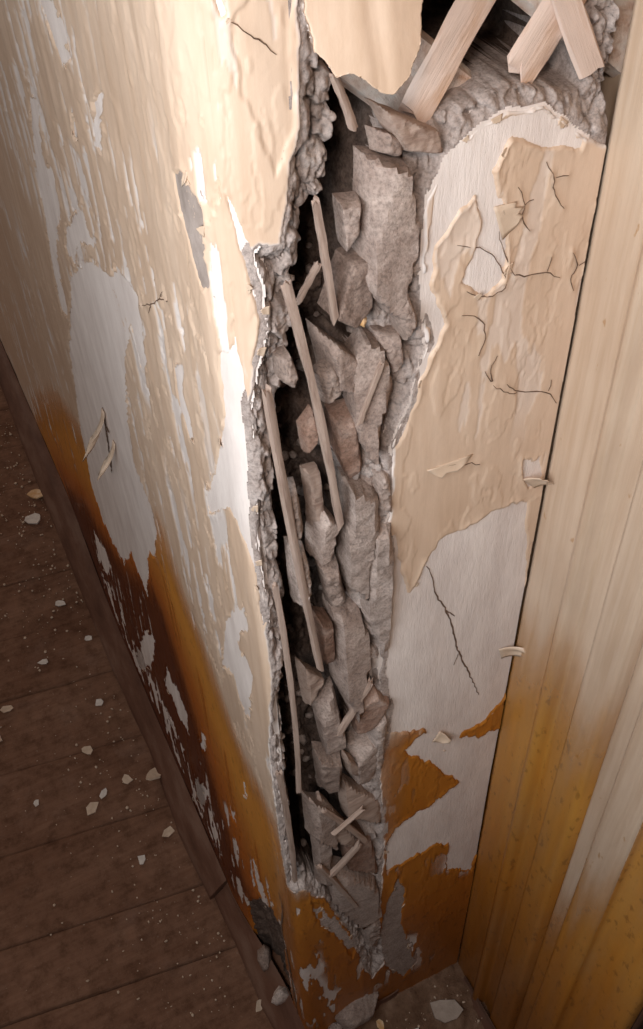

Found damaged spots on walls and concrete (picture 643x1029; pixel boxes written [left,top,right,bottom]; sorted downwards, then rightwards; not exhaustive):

peeling [41,0,71,69]
flaking render [352,0,619,490]
crack [457,233,585,403]
crack [518,162,569,231]
peeling [29,92,222,855]
flaking render [205,0,527,979]
crack [426,566,479,695]